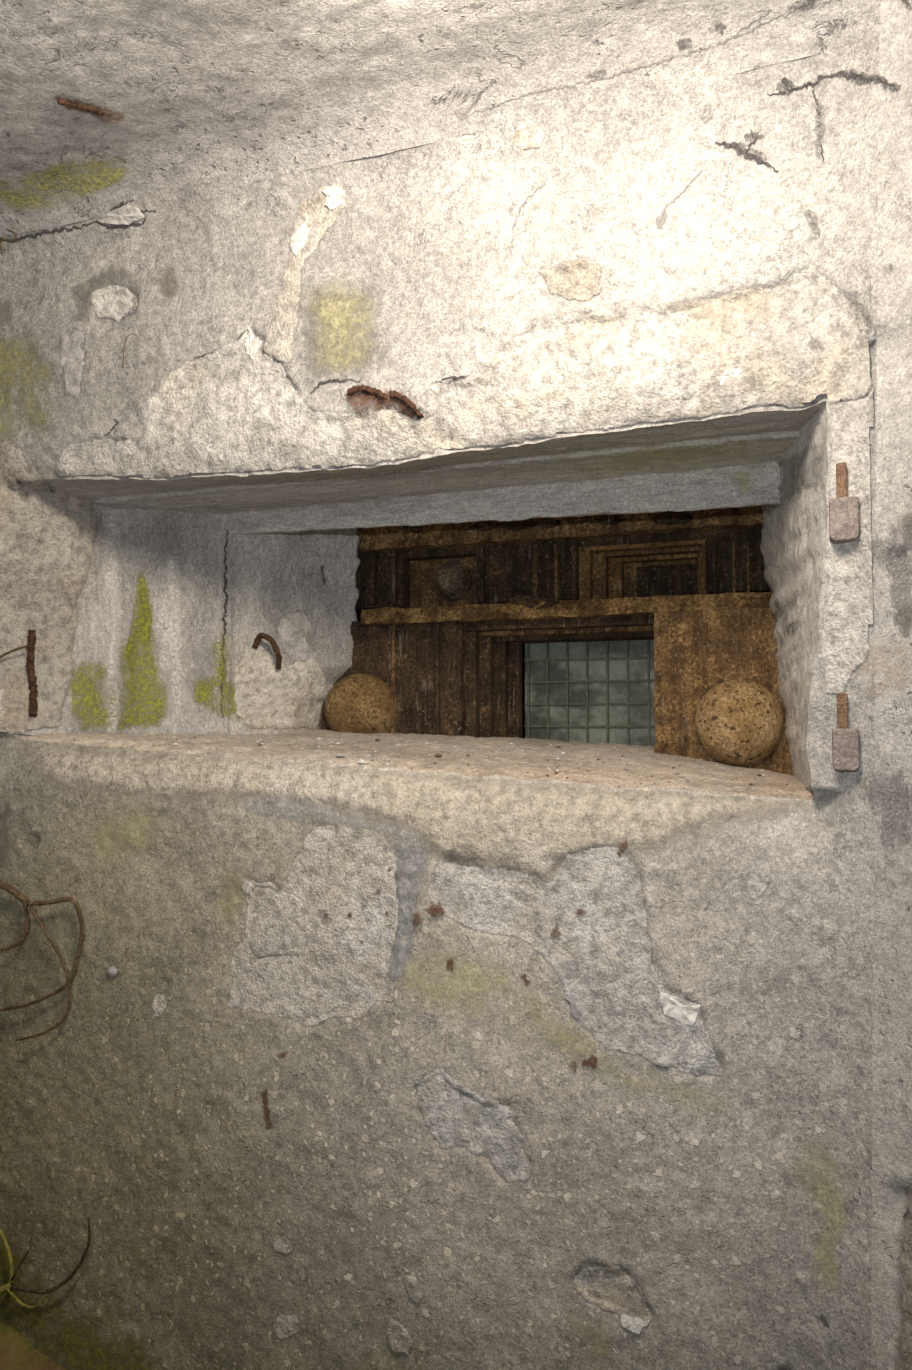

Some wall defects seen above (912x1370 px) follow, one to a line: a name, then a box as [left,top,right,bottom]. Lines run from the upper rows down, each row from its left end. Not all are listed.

corrosion [55,96,124,122]
crack [767,68,901,161]
crack [13,200,156,242]
crack [656,129,779,229]
corrosion [346,385,424,420]
spalling [0,184,876,735]
damp [105,510,118,732]
damp [156,561,184,714]
corrosion [262,1090,272,1129]
spalling [897,1183,912,1370]